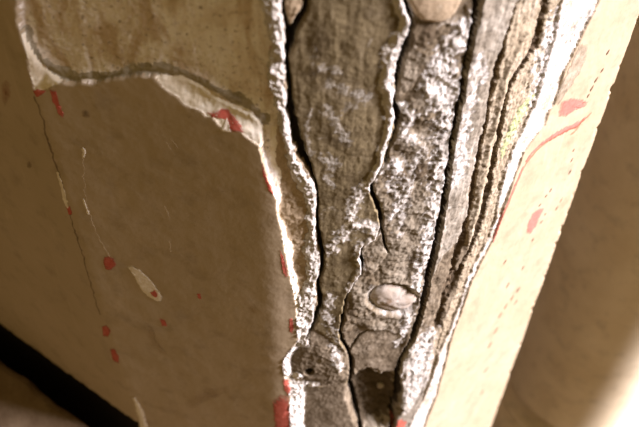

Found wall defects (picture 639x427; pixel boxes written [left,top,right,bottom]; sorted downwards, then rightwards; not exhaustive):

spalling [18,0,309,332]
peeling [273,370,292,427]
crack [281,0,325,334]
crack [338,287,363,427]
crack [370,182,388,250]
spalling [281,0,604,427]
crack [384,0,548,427]